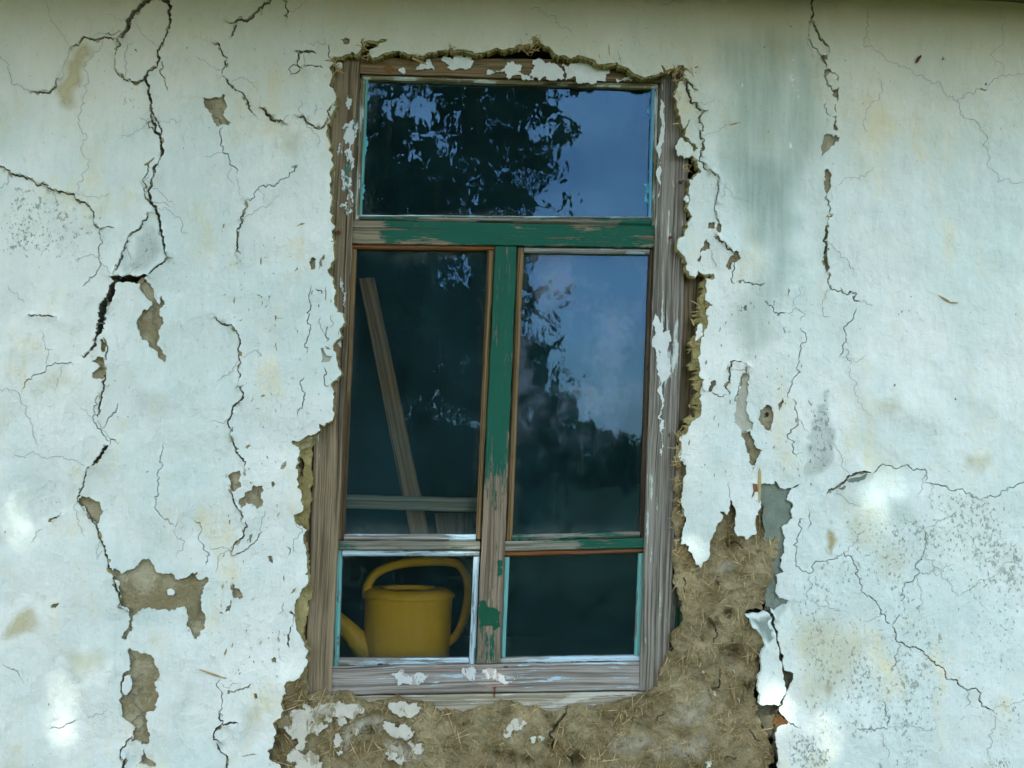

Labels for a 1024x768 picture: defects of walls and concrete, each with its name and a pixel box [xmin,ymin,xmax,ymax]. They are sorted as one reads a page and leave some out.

flaking render [204,95,230,127]
crack [199,0,332,147]
crack [204,135,297,252]
crack [0,0,186,611]
flaking render [137,277,166,362]
crack [210,317,262,466]
flaking render [220,37,755,768]
flaking render [730,368,787,470]
crack [683,78,1023,760]
crack [156,447,265,570]
flaking render [111,559,209,766]
crack [213,680,253,768]